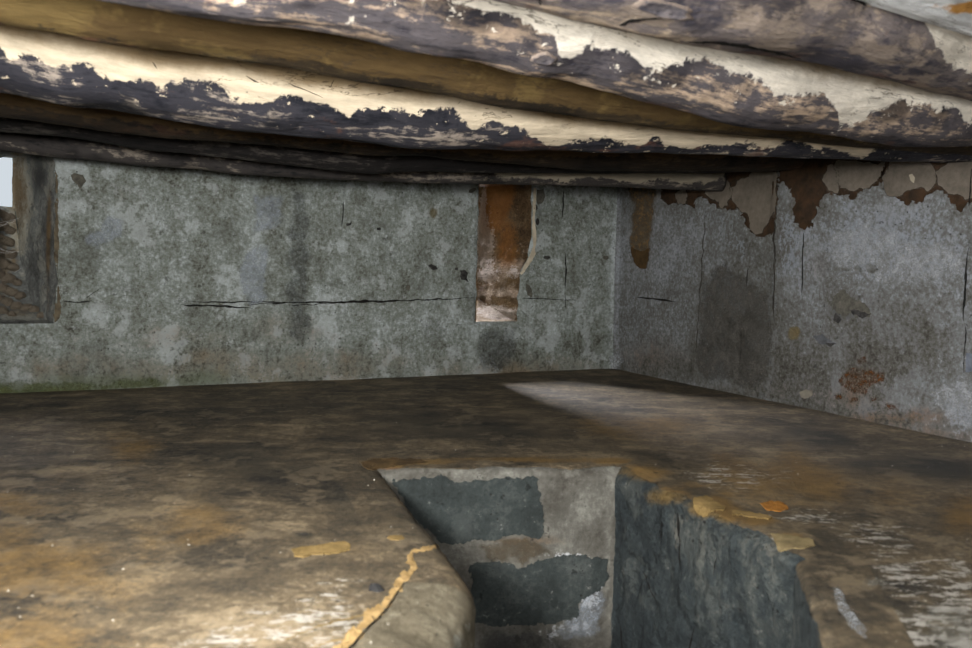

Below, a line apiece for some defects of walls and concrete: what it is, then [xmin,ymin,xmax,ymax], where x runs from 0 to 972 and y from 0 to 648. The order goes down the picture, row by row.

flaking render [660,158,972,237]
crack [185,297,474,309]
corrosion [835,356,884,402]
spalling [332,456,916,648]
crack [284,544,439,648]